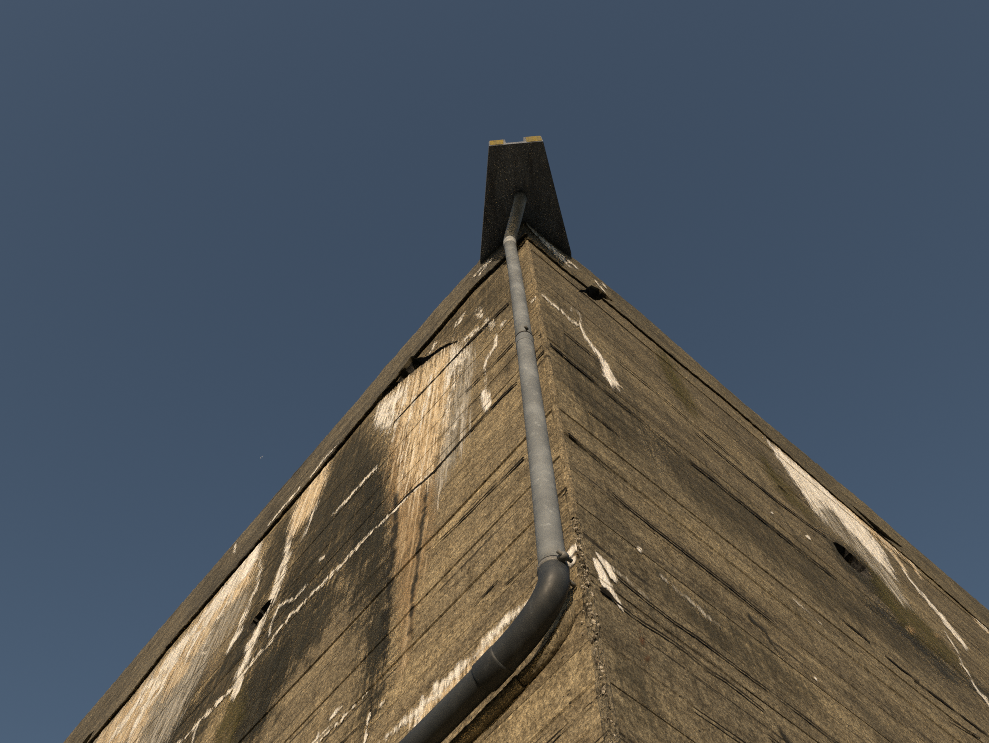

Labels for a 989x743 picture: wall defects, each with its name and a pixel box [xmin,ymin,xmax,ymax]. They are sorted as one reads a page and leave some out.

spalling [378,341,458,403]
leakage [455,283,504,411]
leakage [532,294,645,438]
spalling [579,287,608,301]
leakage [94,424,430,743]
leakage [593,552,629,610]
leakage [671,438,989,706]
leakage [385,600,528,738]